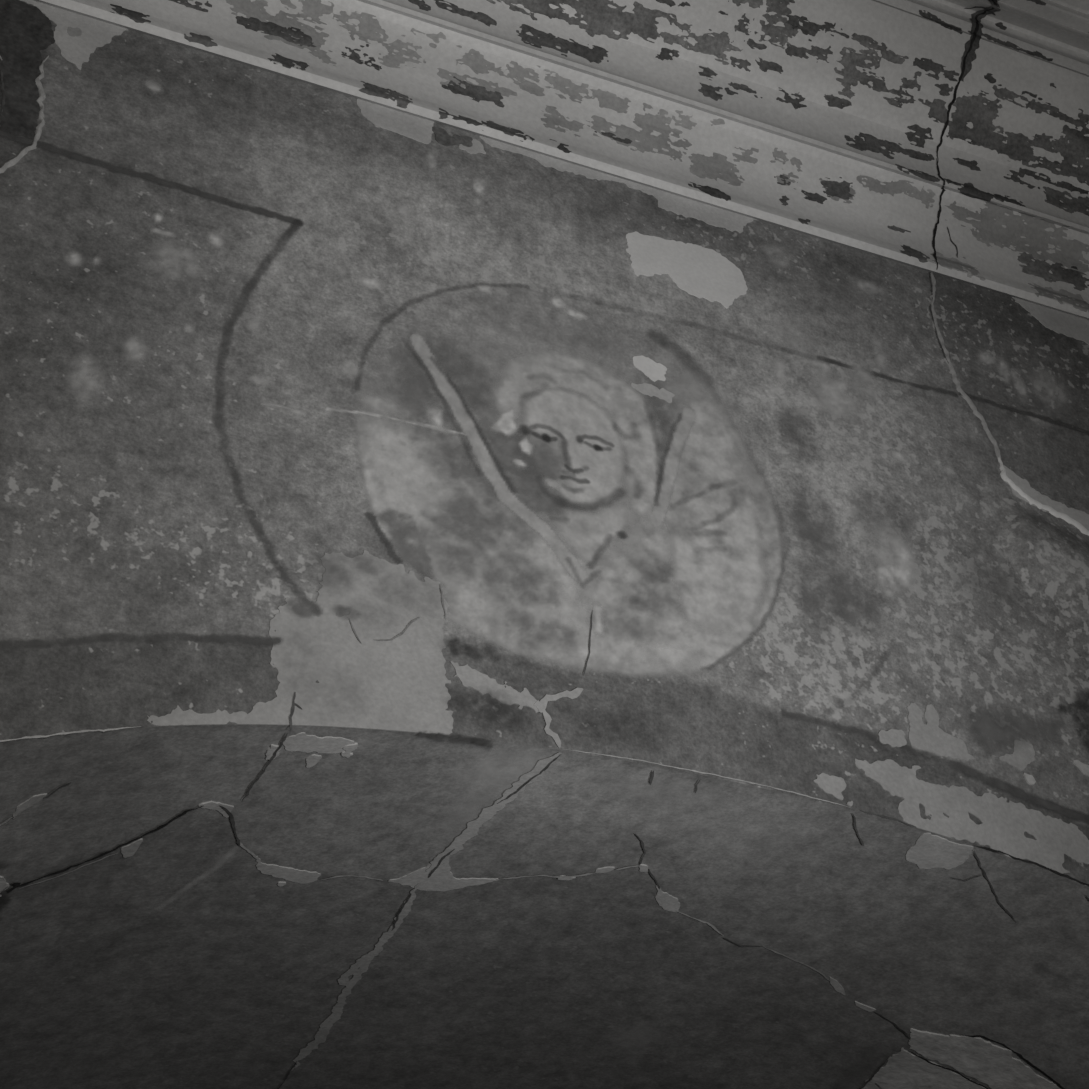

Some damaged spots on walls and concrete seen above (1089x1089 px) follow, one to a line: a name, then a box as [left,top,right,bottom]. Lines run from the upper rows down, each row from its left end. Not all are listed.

peeling [169,0,212,12]
peeling [184,32,218,47]
peeling [226,0,1089,345]
crack [930,0,1089,536]
spalling [0,550,539,768]
crack [0,692,302,894]
crack [278,611,593,1089]
spalling [565,749,853,808]
spalling [854,703,1089,874]
crack [953,846,1089,922]
crack [859,1012,988,1089]
crack [963,1035,1065,1089]